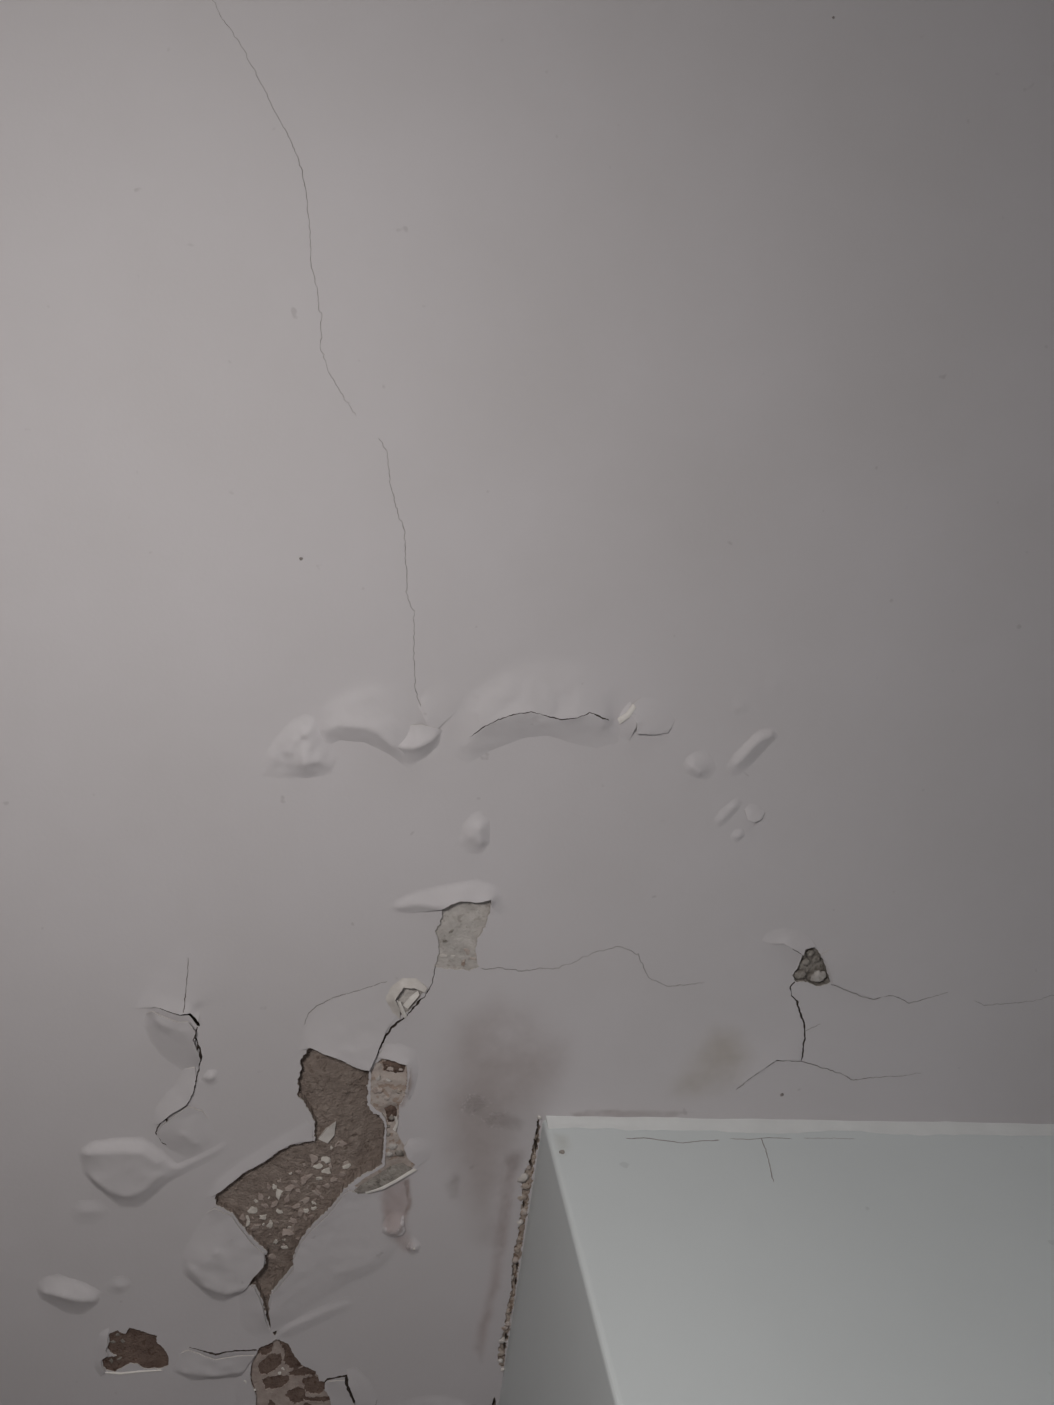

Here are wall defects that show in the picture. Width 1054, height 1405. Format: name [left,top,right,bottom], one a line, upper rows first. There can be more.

crack [212,0,356,415]
spalling [379,879,513,971]
crack [481,946,689,987]
spalling [762,928,902,999]
crack [730,981,916,1089]
spalling [93,978,436,1405]
crack [325,1367,378,1405]